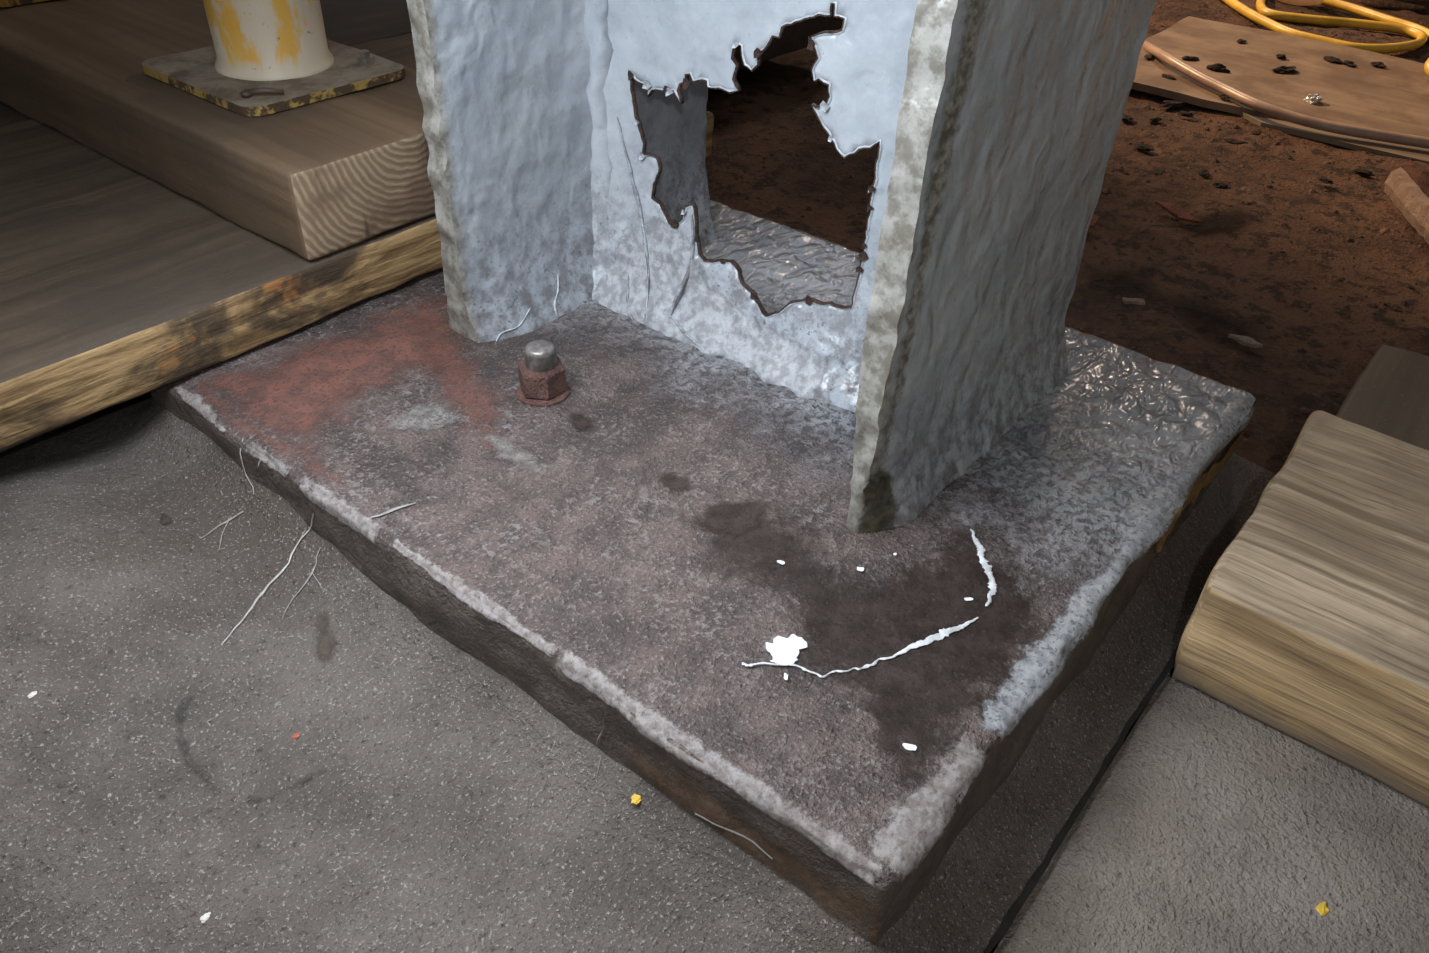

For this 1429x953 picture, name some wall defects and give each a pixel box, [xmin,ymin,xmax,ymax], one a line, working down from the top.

peeling [732,39,763,58]
peeling [628,70,690,96]
peeling [855,243,869,273]
leakage [703,500,1036,778]